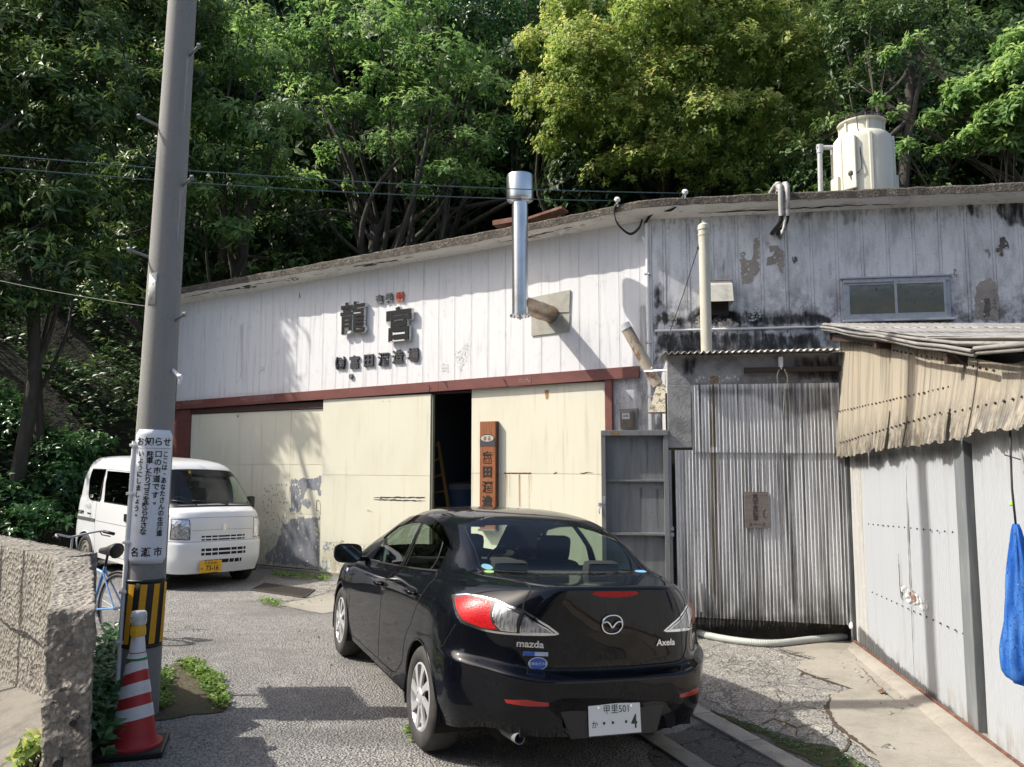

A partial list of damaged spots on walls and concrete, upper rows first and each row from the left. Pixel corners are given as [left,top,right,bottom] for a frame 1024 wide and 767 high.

damp [997,203,1024,226]
peeling [739,237,798,293]
peeling [984,237,1010,259]
peeling [716,296,764,328]
peeling [973,278,1000,321]
damp [654,287,837,382]
peeling [263,475,343,572]
peeling [900,585,930,612]